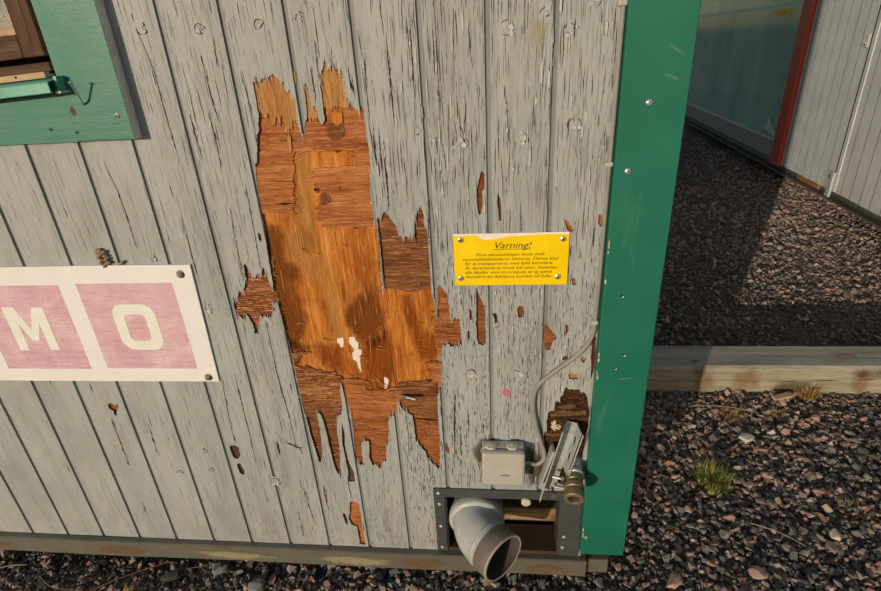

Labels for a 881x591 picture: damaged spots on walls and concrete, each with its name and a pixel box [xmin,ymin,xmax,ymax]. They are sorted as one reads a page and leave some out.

peeling [477,171,485,214]
peeling [337,337,362,373]
peeling [468,288,498,345]
peeling [544,324,568,349]
peeling [544,402,586,437]
peeling [231,445,245,473]
peeling [342,426,355,481]
peeling [343,501,365,543]